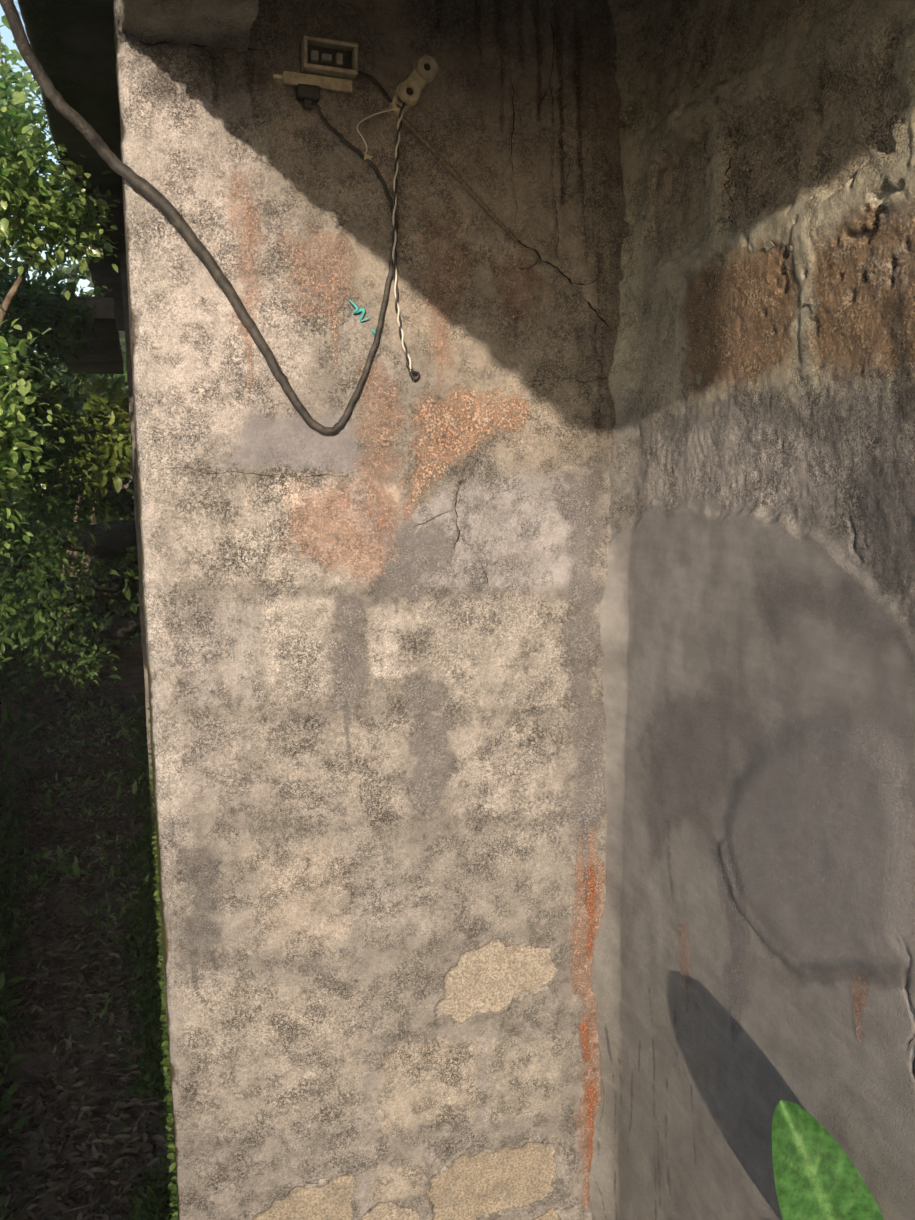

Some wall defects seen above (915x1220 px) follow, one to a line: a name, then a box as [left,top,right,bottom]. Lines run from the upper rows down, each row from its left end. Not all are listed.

crack [500,9,609,407]
crack [415,484,489,585]
spalling [434,939,557,1023]
corrosion [570,827,605,1208]
water stain [711,839,748,1040]
spalling [253,1142,560,1220]